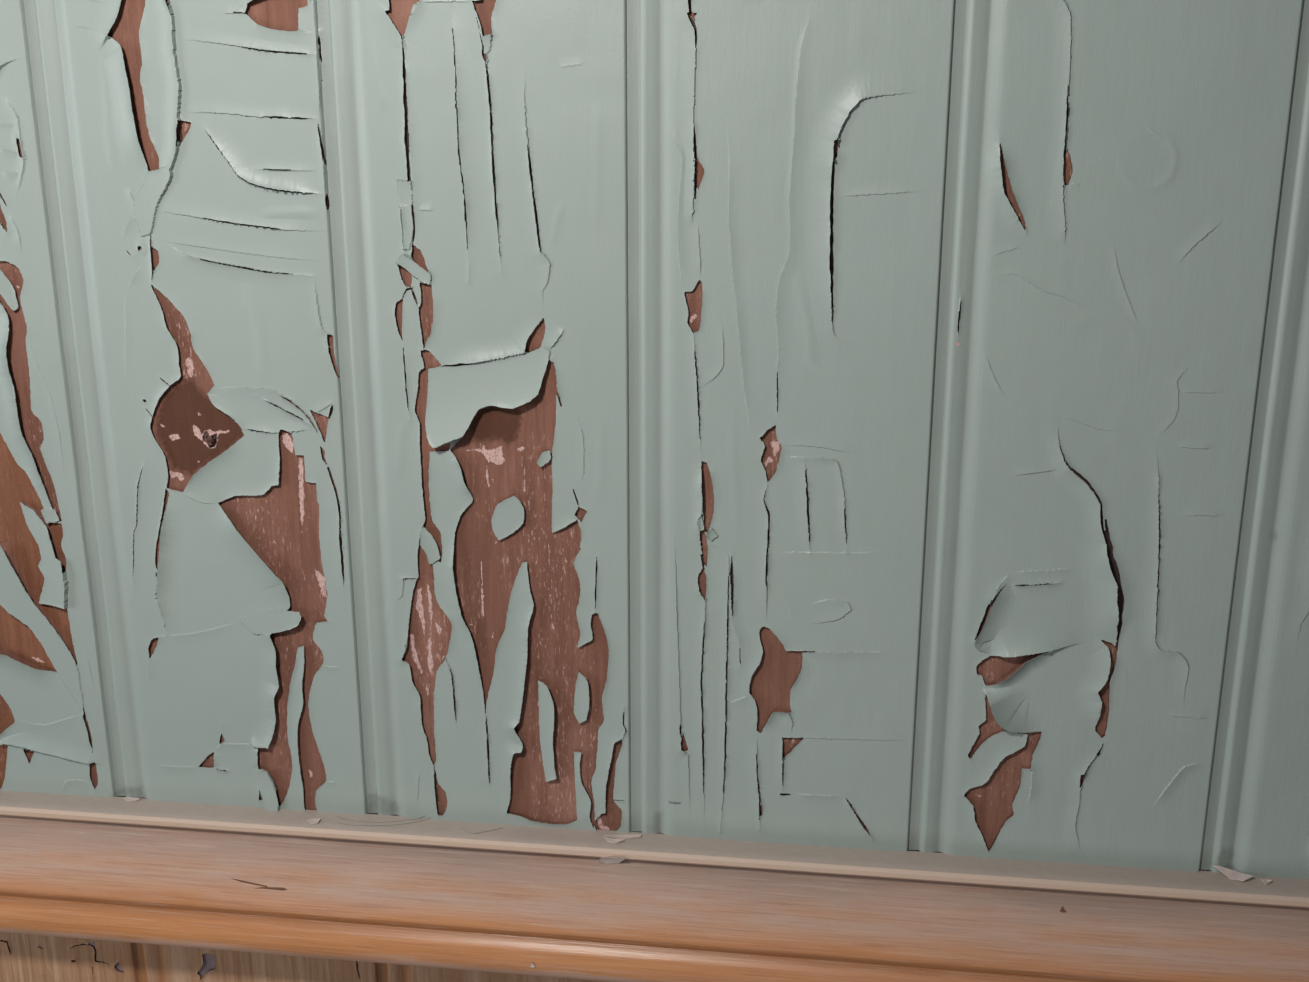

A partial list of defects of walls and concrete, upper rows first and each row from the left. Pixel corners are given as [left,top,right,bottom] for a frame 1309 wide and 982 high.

crack [152,0,330,286]
peeling [375,0,501,60]
crack [671,0,916,425]
crack [986,0,1080,242]
peeling [0,261,102,791]
peeling [75,0,345,825]
peeling [386,181,642,864]
crack [718,551,872,837]
peeling [742,425,900,788]
crack [782,456,876,560]
peeling [965,568,1081,849]
crack [1014,369,1207,848]